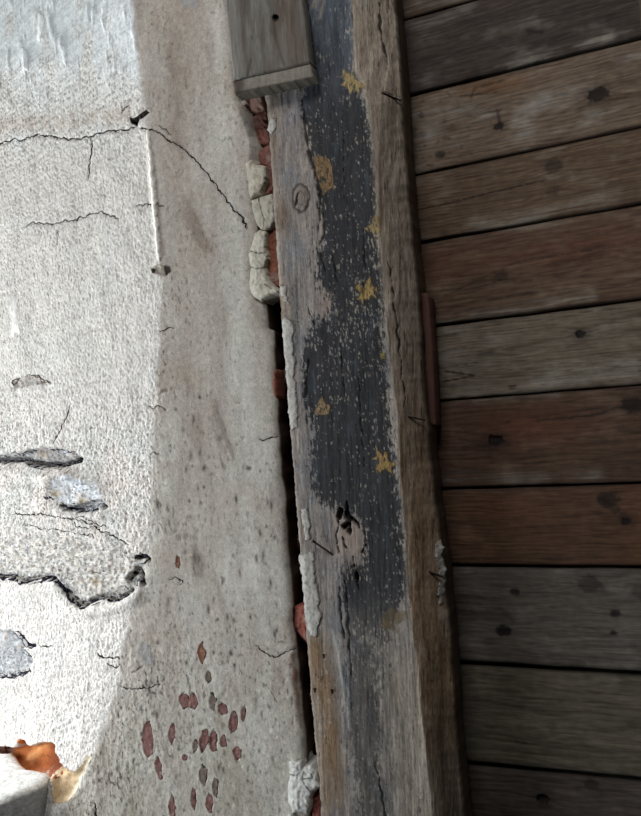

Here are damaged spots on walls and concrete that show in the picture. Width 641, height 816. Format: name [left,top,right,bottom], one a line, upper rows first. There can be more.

crack [0,105,247,228]
crack [26,211,117,242]
spalling [0,447,107,513]
crack [12,512,129,574]
spalling [0,629,36,679]
peeling [179,692,198,710]
peeling [182,641,246,761]
peeling [141,720,162,780]
peeling [51,755,91,804]
peeling [168,795,176,816]
peeling [191,764,218,813]